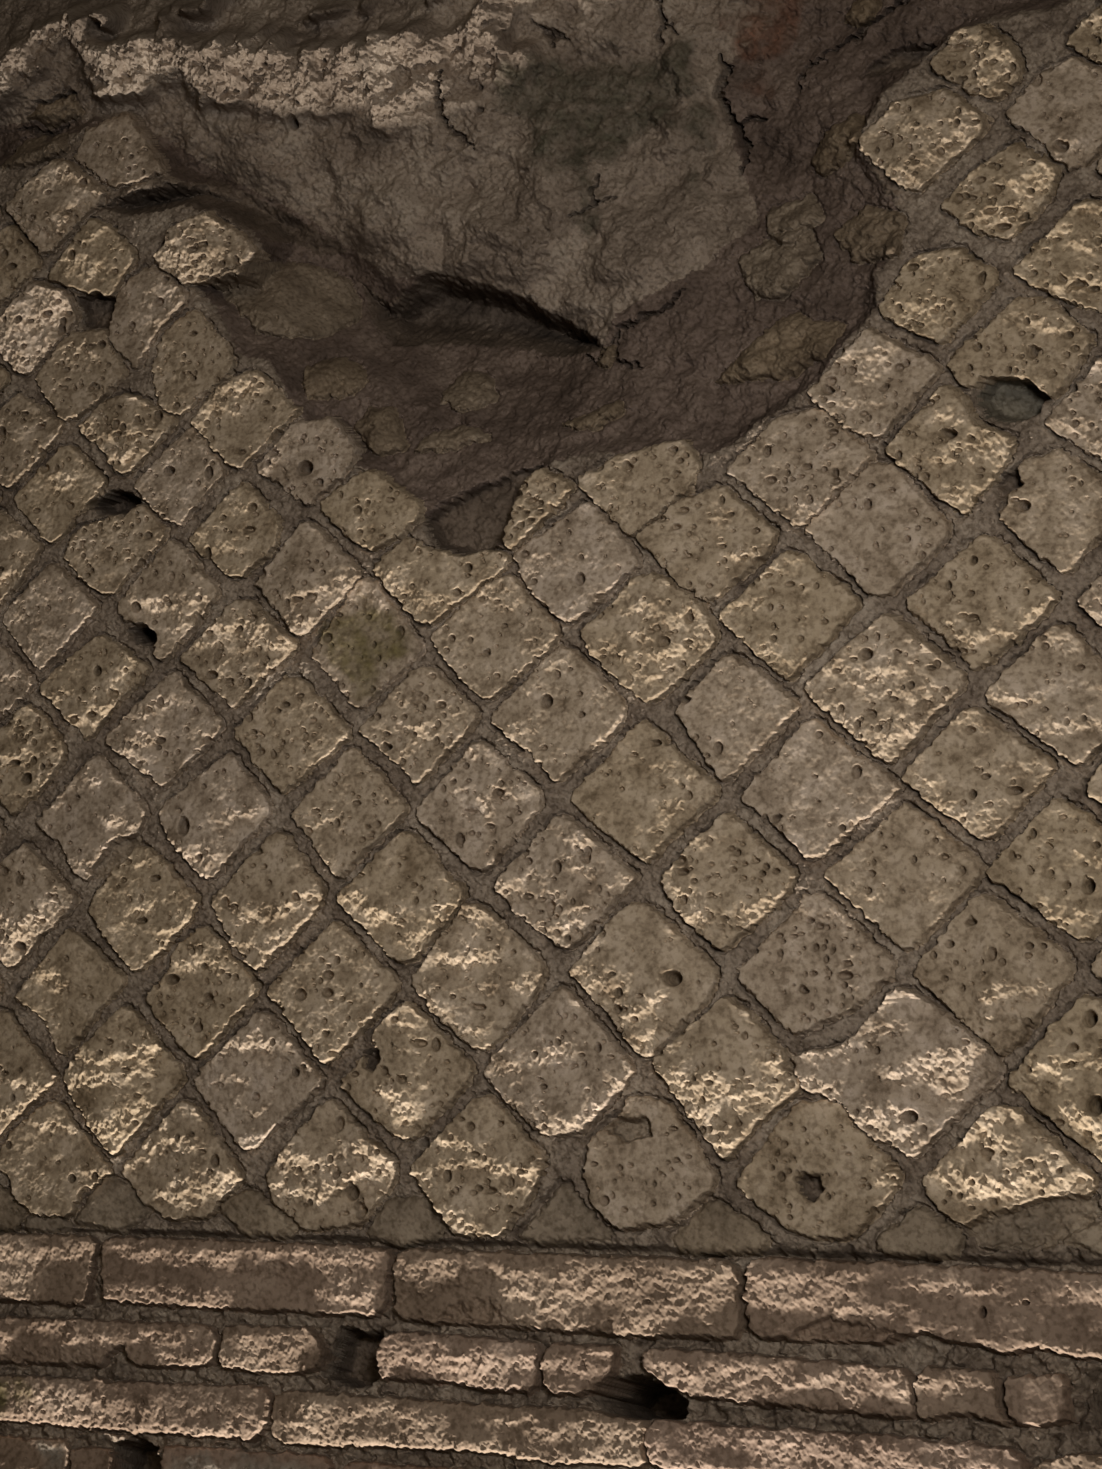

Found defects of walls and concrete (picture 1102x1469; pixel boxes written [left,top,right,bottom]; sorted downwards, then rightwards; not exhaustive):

crack [797,0,910,91]
spalling [0,94,105,170]
crack [718,62,768,172]
spalling [80,293,116,329]
spalling [94,0,1068,555]
crack [585,296,680,370]
spalling [329,1329,384,1388]
spalling [602,1381,689,1420]
spalling [123,1441,162,1469]